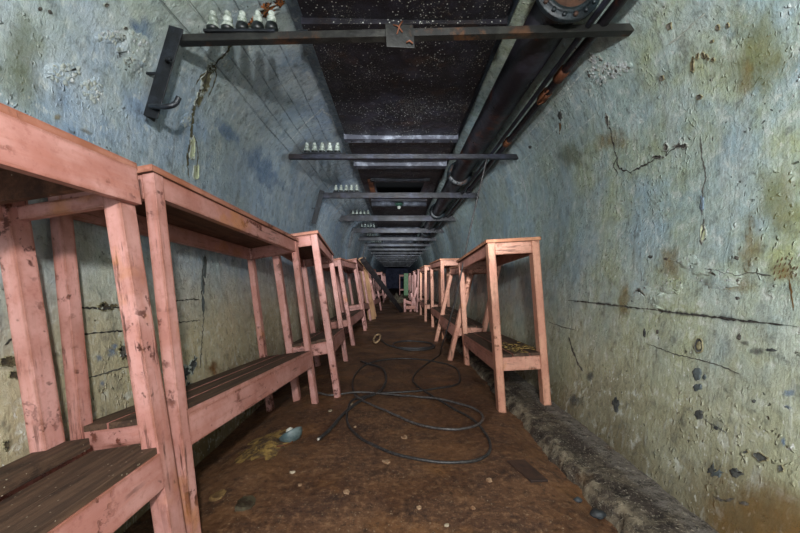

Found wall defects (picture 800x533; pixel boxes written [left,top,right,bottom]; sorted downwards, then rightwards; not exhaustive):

crack [607,117,707,215]
crack [82,304,119,312]
crack [176,254,207,367]
crack [568,300,797,327]
crack [84,328,122,336]
crack [549,322,583,371]
crack [651,345,739,374]
peeling [692,368,707,391]